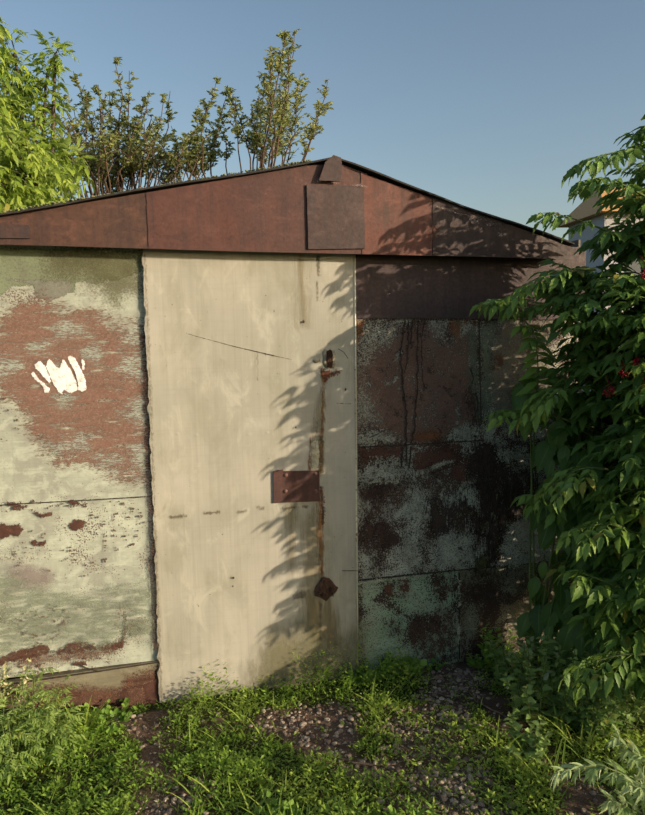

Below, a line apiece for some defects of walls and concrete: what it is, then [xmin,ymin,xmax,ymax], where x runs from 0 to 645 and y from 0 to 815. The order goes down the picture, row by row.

peeling [0,248,152,491]
rust [318,367,342,473]
leakage [399,320,425,468]
rust [357,428,477,599]
rust [0,665,161,714]
rust [384,573,481,663]